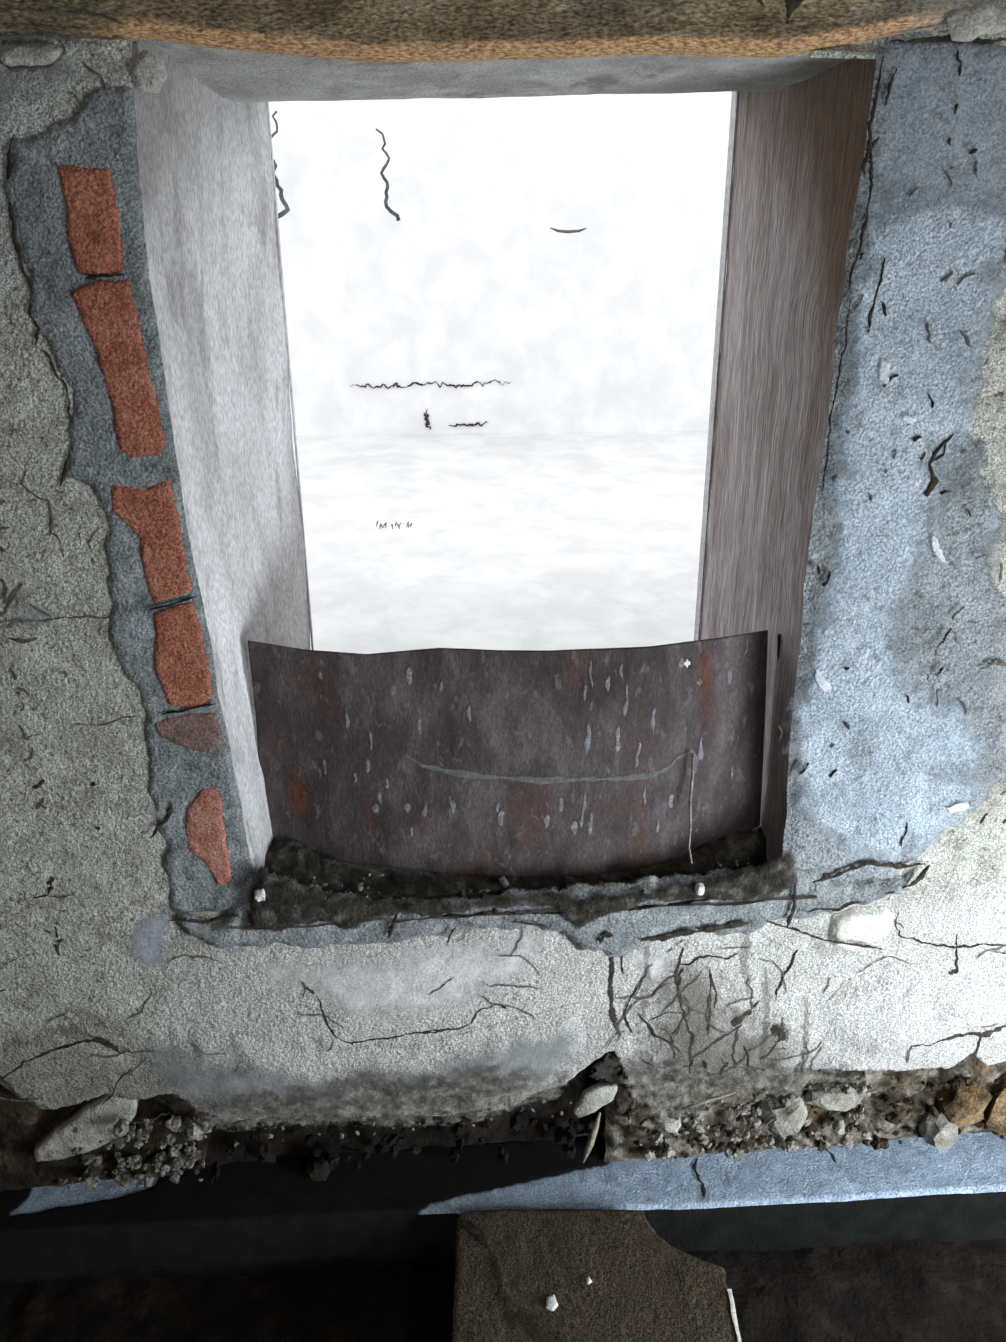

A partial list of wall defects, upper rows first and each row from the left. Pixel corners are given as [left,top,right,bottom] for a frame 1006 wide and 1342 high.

flaking render [5,50,256,913]
crack [0,894,48,992]
crack [166,954,219,963]
crack [297,926,541,1052]
crack [605,940,809,1075]
leakage [639,954,783,1079]
crack [800,823,1006,975]
crack [905,1023,1006,1074]